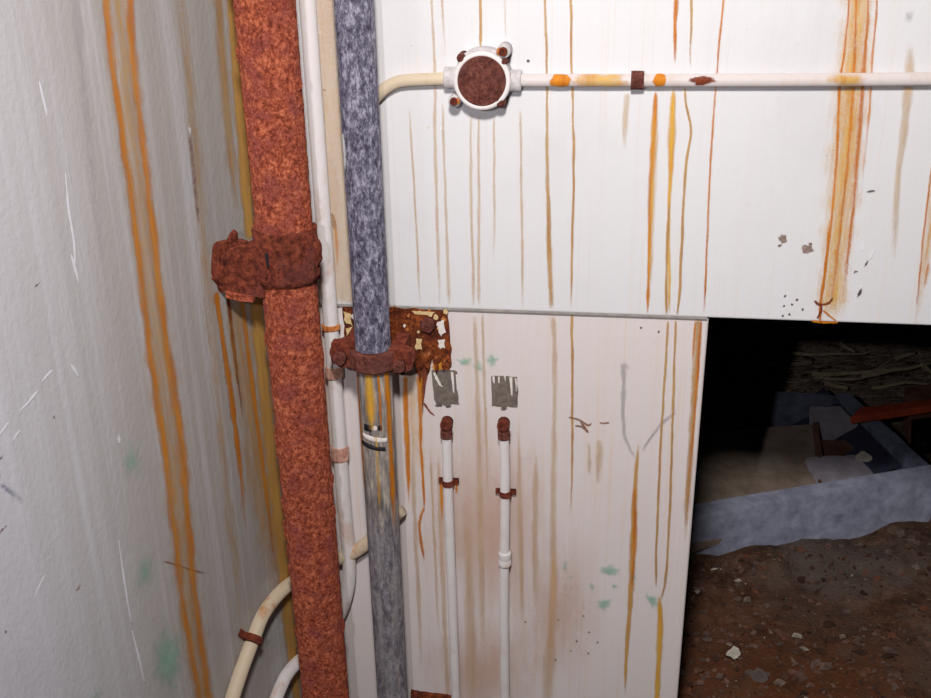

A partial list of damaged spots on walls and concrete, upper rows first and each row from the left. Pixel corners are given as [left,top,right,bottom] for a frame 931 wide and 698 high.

rust [102,0,217,698]
rust [356,356,452,695]
rust [624,444,639,691]
rust [646,73,692,698]
rust [683,319,702,541]
rust [703,87,717,308]
rust [812,0,878,324]
rust [892,86,914,254]
rust [914,169,931,324]